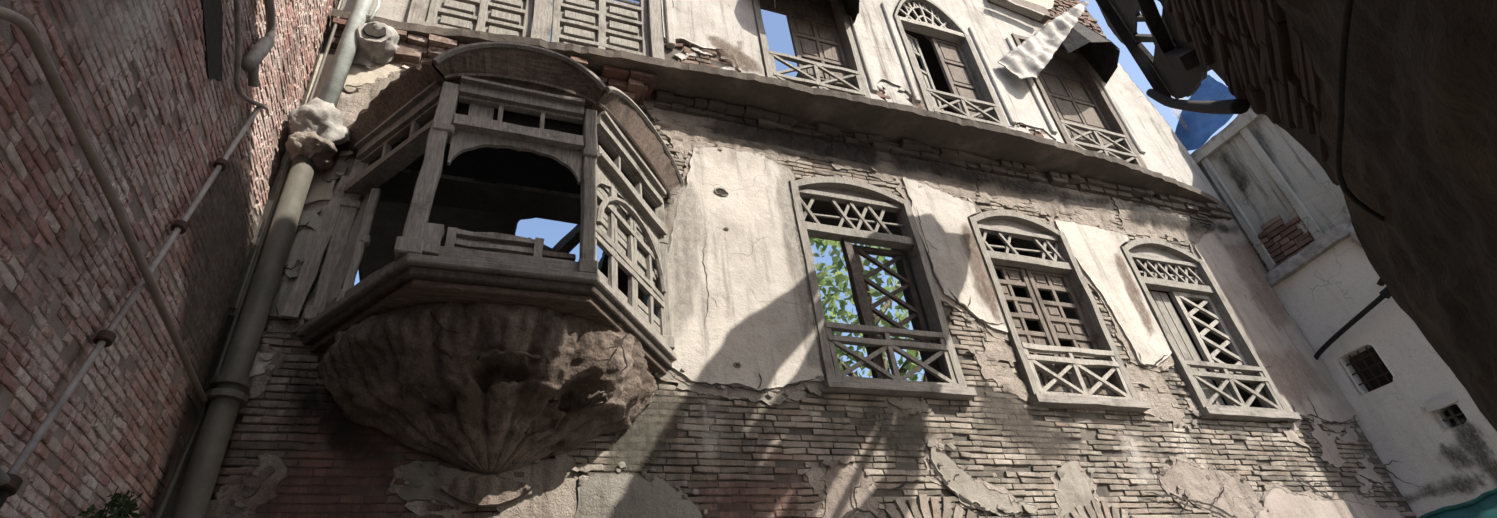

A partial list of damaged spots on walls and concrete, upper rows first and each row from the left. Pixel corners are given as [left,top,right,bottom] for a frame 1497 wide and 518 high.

spalling [663,40,742,71]
flaking render [247,342,288,399]
spalling [655,368,828,411]
spalling [962,312,1029,402]
spalling [1124,362,1203,430]
flaking render [204,453,288,518]
flaking render [388,460,472,518]
flaking render [491,449,593,518]
flaking render [805,458,883,518]
flaking render [923,434,1103,518]
flaking render [1156,454,1269,518]
spalling [1280,417,1388,495]